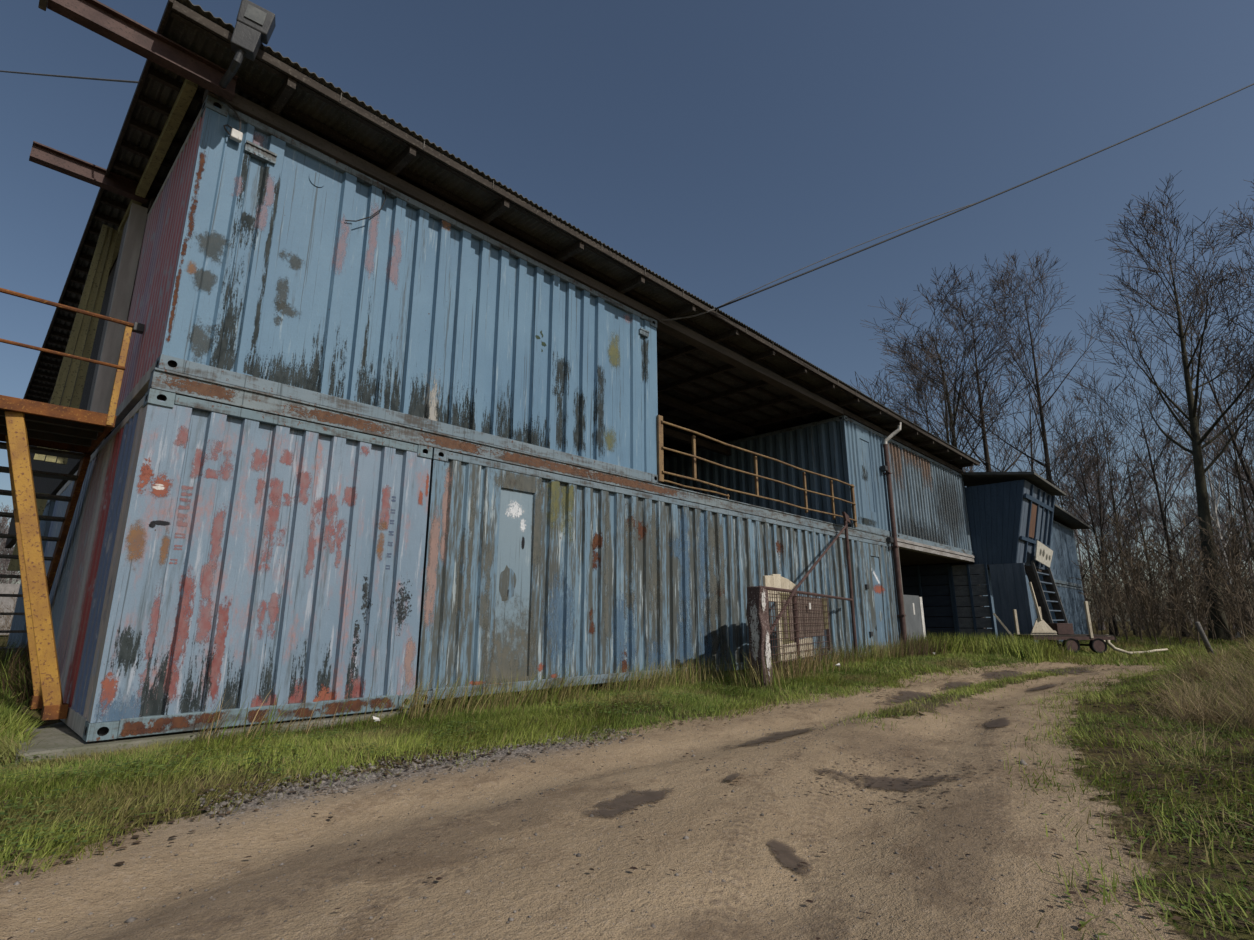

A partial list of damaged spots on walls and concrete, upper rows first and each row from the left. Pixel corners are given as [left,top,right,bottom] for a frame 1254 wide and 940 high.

corrosion [166,153,206,341]
corrosion [157,373,235,402]
leakage [187,152,606,459]
leakage [641,339,650,383]
corrosion [121,712,225,737]
leakage [110,625,242,717]
peeling [137,426,233,703]
peeling [251,449,356,574]
corrosion [293,697,395,718]
leakage [345,577,372,698]
peeling [418,469,494,631]
peeling [603,498,662,671]